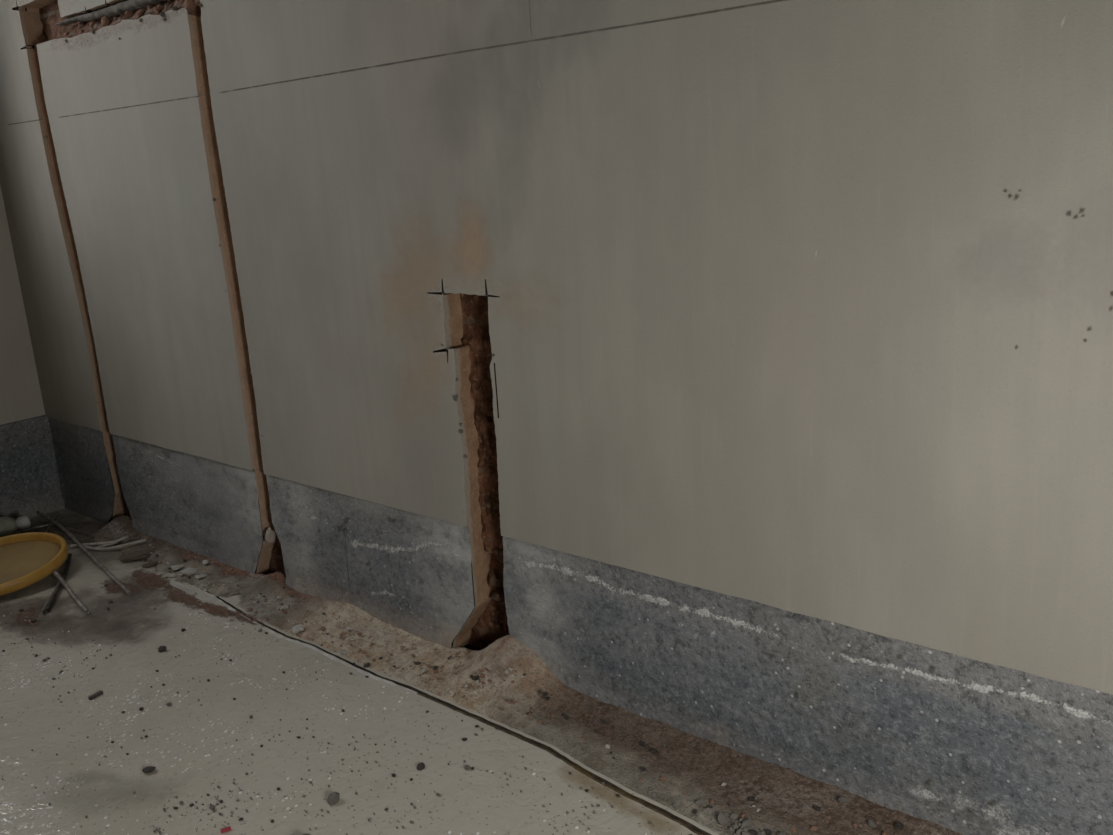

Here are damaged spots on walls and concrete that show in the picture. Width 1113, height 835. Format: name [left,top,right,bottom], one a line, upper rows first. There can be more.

flaking render [39,0,201,41]
flaking render [460,293,509,650]
flaking render [265,527,286,577]